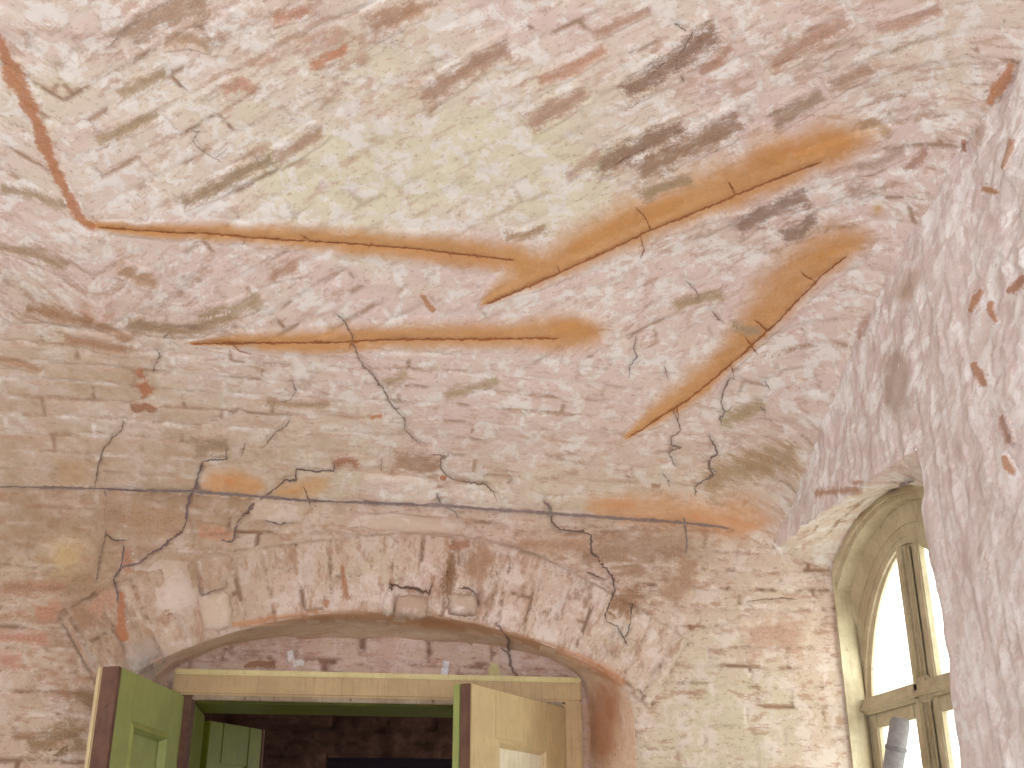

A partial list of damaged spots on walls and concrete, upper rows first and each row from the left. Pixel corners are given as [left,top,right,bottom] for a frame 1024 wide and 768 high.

crack [0,315,733,646]
corrosion [91,101,893,361]
corrosion [578,482,789,551]
crack [628,256,847,496]
corrosion [619,196,891,443]